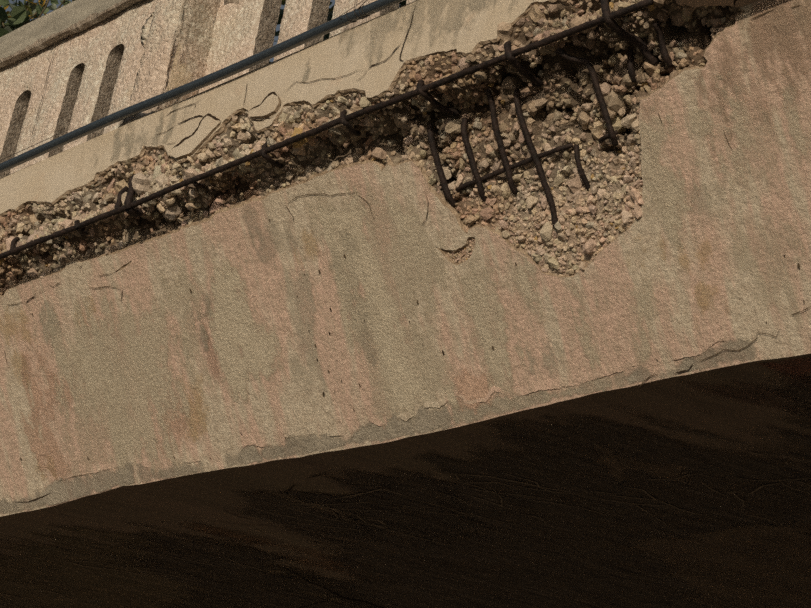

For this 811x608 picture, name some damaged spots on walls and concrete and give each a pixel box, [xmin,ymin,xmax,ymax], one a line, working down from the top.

crack [156,102,221,156]
crack [243,5,416,121]
spalling [0,0,745,297]
leakage [40,277,195,471]
leakage [179,259,281,402]
leakage [309,188,458,421]
leakage [462,259,525,391]